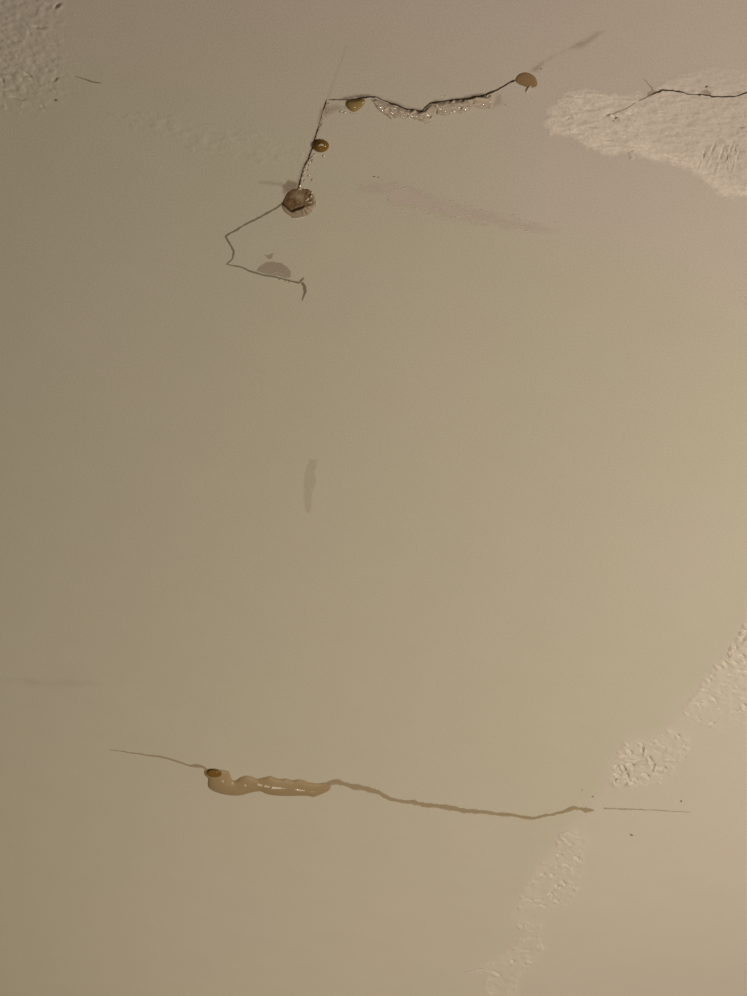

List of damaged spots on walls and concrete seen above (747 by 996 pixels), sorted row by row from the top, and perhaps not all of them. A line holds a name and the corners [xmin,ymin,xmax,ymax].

crack [610,86,747,115]
flaking render [538,59,747,204]
crack [225,80,516,300]
crack [111,750,207,769]
crack [326,780,594,820]